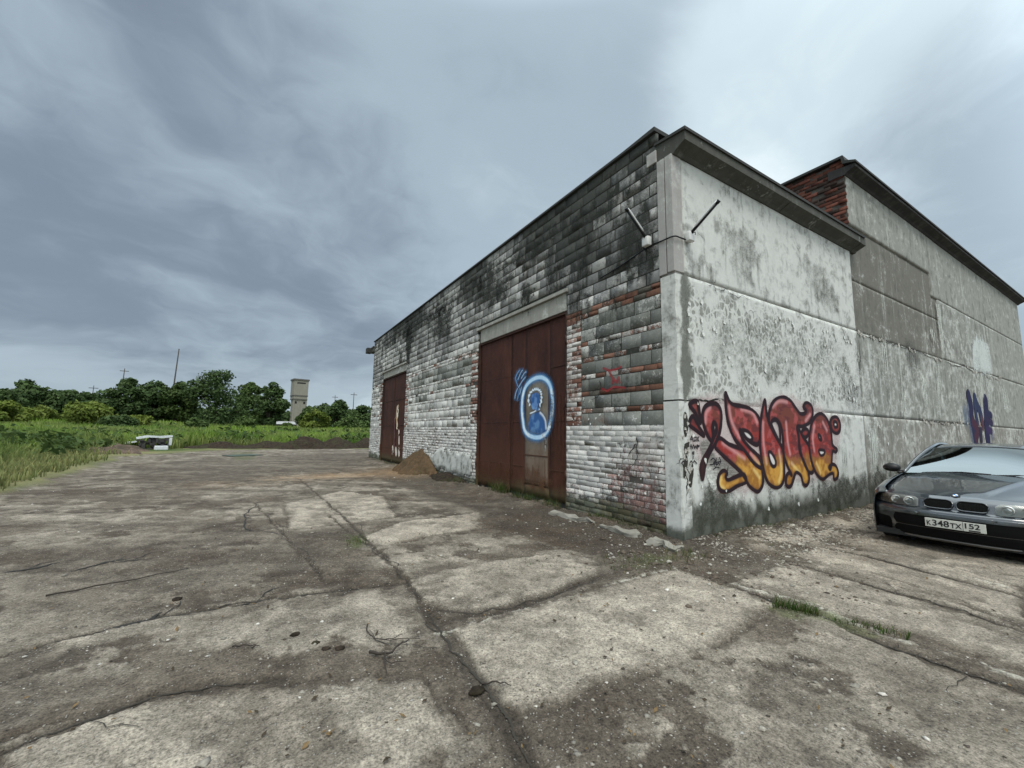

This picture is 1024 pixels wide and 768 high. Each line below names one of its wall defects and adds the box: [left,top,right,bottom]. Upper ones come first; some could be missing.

mould [378,174,658,364]
peeling [680,272,876,492]
damp [692,429,907,534]
crack [0,480,593,767]